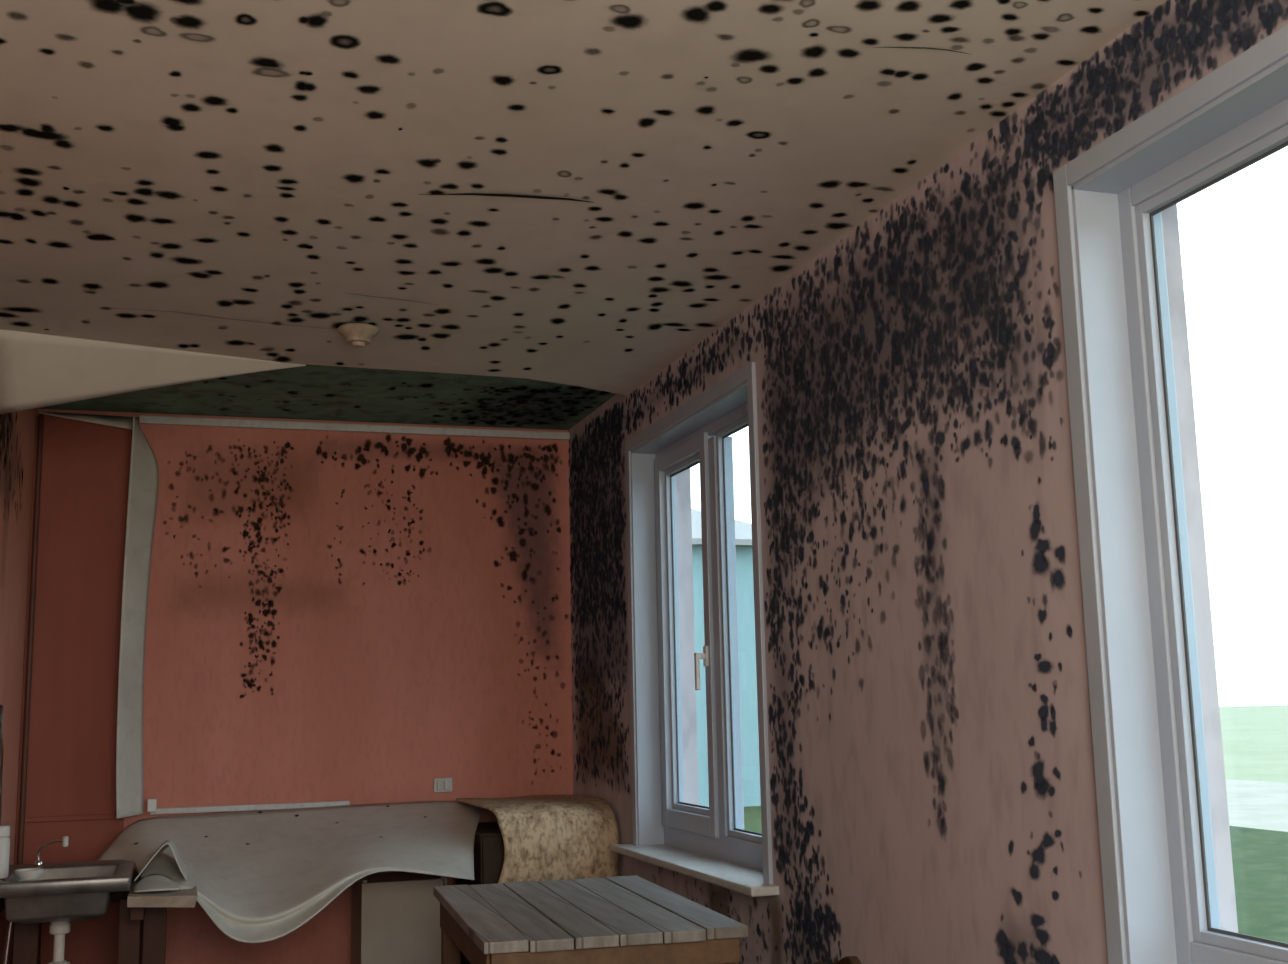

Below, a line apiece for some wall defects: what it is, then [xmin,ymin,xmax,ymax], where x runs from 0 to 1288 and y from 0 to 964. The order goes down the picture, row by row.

leakage [92,0,213,43]
leakage [236,14,257,25]
leakage [252,58,316,101]
leakage [163,96,237,131]
leakage [0,125,72,148]
leakage [197,152,227,191]
leakage [264,145,297,198]
leakage [112,180,180,224]
leakage [151,243,222,278]
leakage [274,0,1288,964]
peeling [0,329,306,819]
leakage [214,441,294,698]